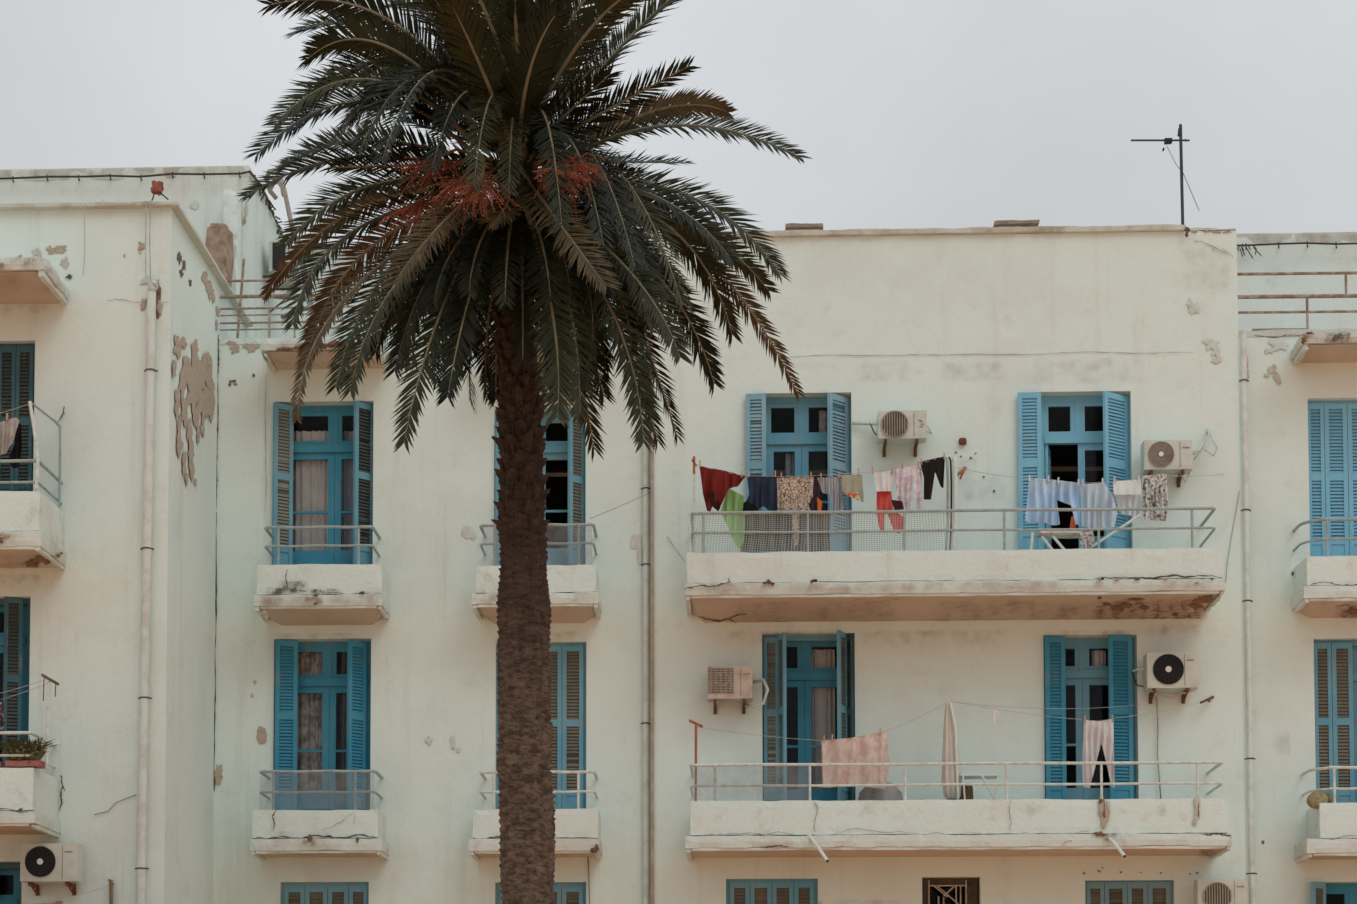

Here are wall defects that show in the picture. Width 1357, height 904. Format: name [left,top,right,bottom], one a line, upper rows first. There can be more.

peeling [18,245,72,279]
spalling [139,275,163,319]
peeling [177,251,302,354]
peeling [172,335,237,486]
spalling [26,552,63,568]